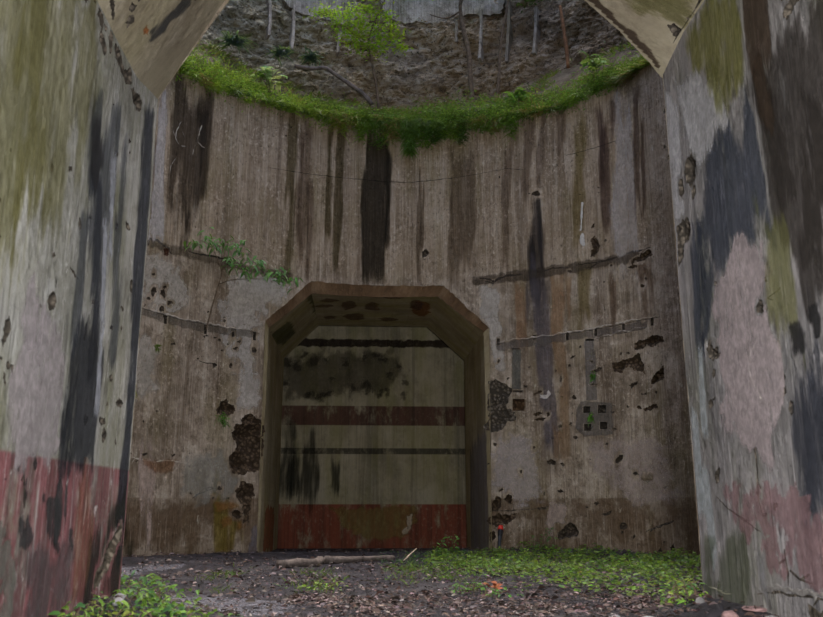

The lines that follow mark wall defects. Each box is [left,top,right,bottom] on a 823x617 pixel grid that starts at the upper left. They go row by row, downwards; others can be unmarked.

leakage [361,138,391,276]
spalling [612,335,665,395]
spalling [483,377,516,432]
spalling [212,399,265,523]
spalling [93,520,122,590]
spalling [808,604,823,617]